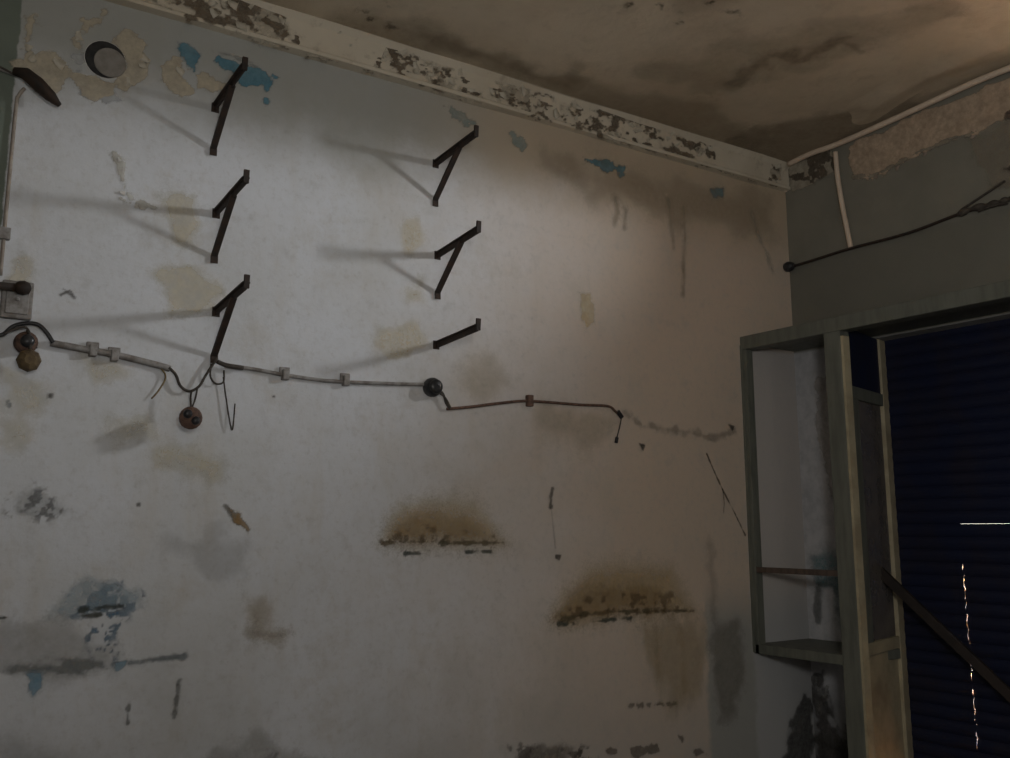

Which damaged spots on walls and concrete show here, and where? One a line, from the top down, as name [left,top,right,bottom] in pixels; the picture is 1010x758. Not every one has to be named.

peeling [175,0,300,49]
peeling [10,9,151,103]
peeling [161,43,226,97]
peeling [214,53,278,105]
peeling [364,47,721,171]
peeling [585,159,625,177]
damp [72,584,143,653]
damp [9,660,102,695]
damp [783,671,848,758]